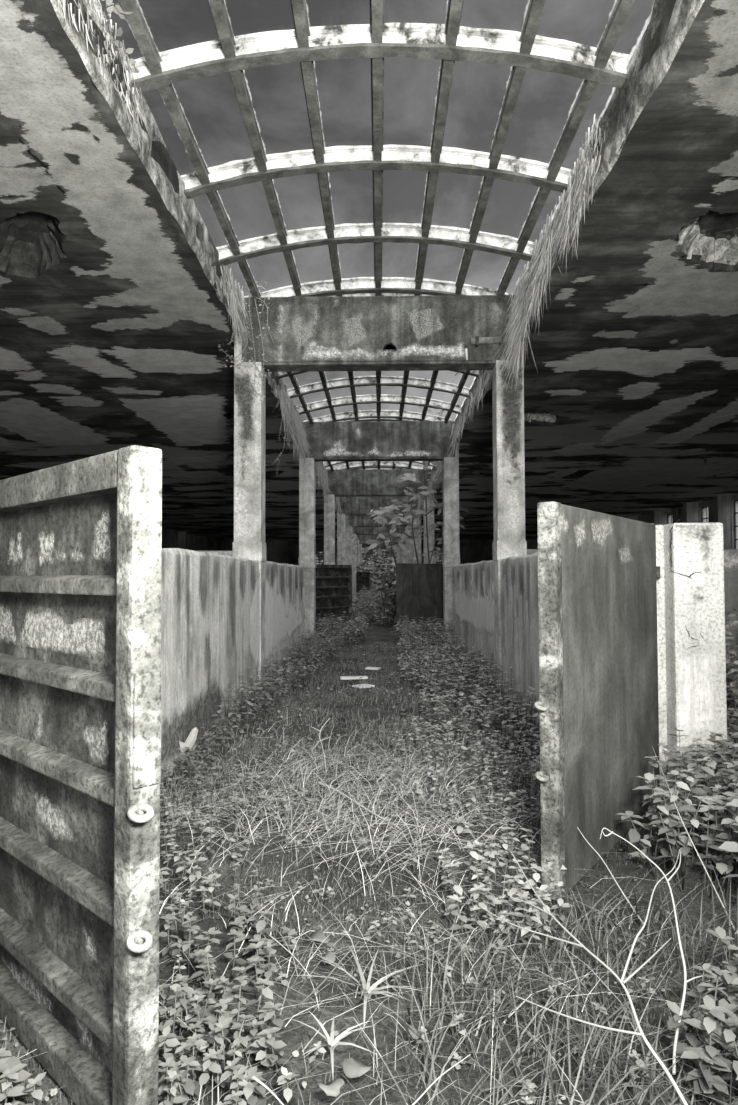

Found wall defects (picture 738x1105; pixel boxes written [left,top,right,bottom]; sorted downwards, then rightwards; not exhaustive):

peeling [683,0,738,118]
peeling [0,0,230,332]
peeling [543,151,738,492]
peeling [0,307,233,492]
spalling [524,411,563,425]
leakage [167,552,305,703]
leakage [455,564,529,657]